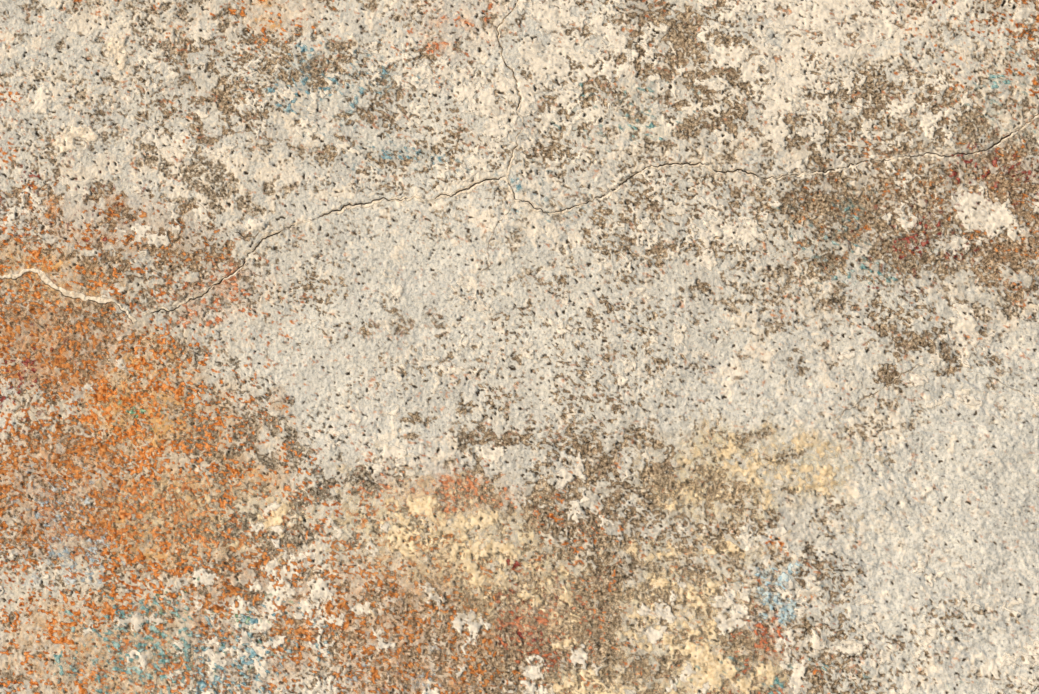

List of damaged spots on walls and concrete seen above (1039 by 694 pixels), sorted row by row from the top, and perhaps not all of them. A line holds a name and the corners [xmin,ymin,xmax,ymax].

crack [0,0,1039,324]
rust [1014,0,1039,46]
rust [0,180,594,694]